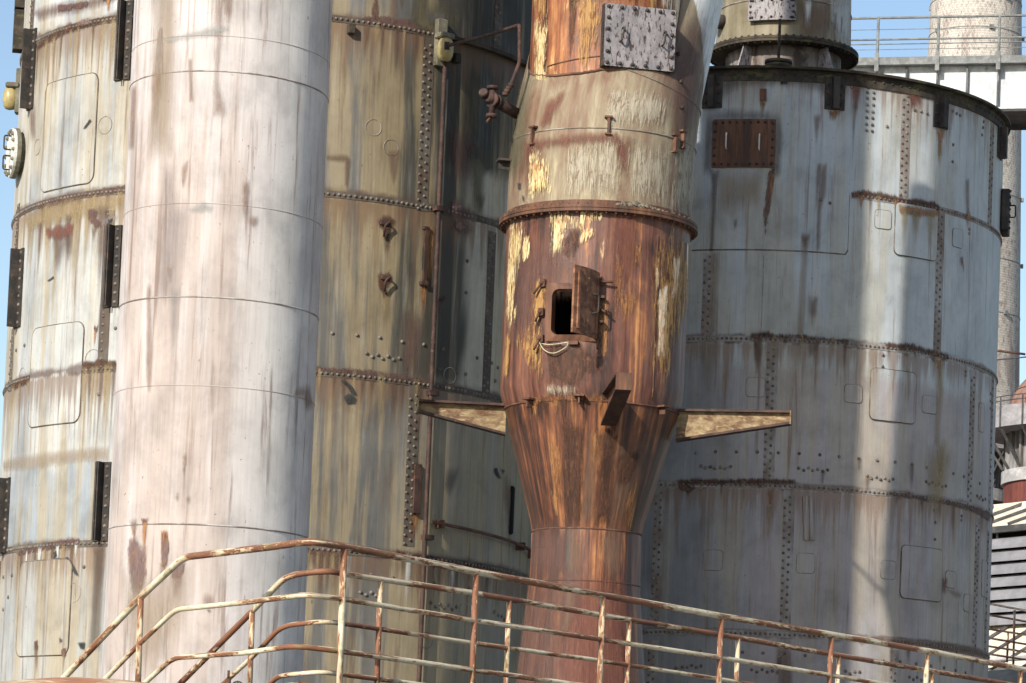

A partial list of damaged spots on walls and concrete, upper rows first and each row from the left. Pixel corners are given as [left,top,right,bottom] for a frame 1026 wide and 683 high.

peeling [608,91,665,126]
rust [379,216,394,247]
peeling [522,153,551,200]
peeling [550,211,602,254]
peeling [567,142,694,215]
rust [851,189,940,233]
peeling [504,220,582,376]
peeling [652,229,691,374]
rust [751,332,846,363]
rust [532,213,641,574]
rust [886,342,948,461]
rust [517,577,631,683]